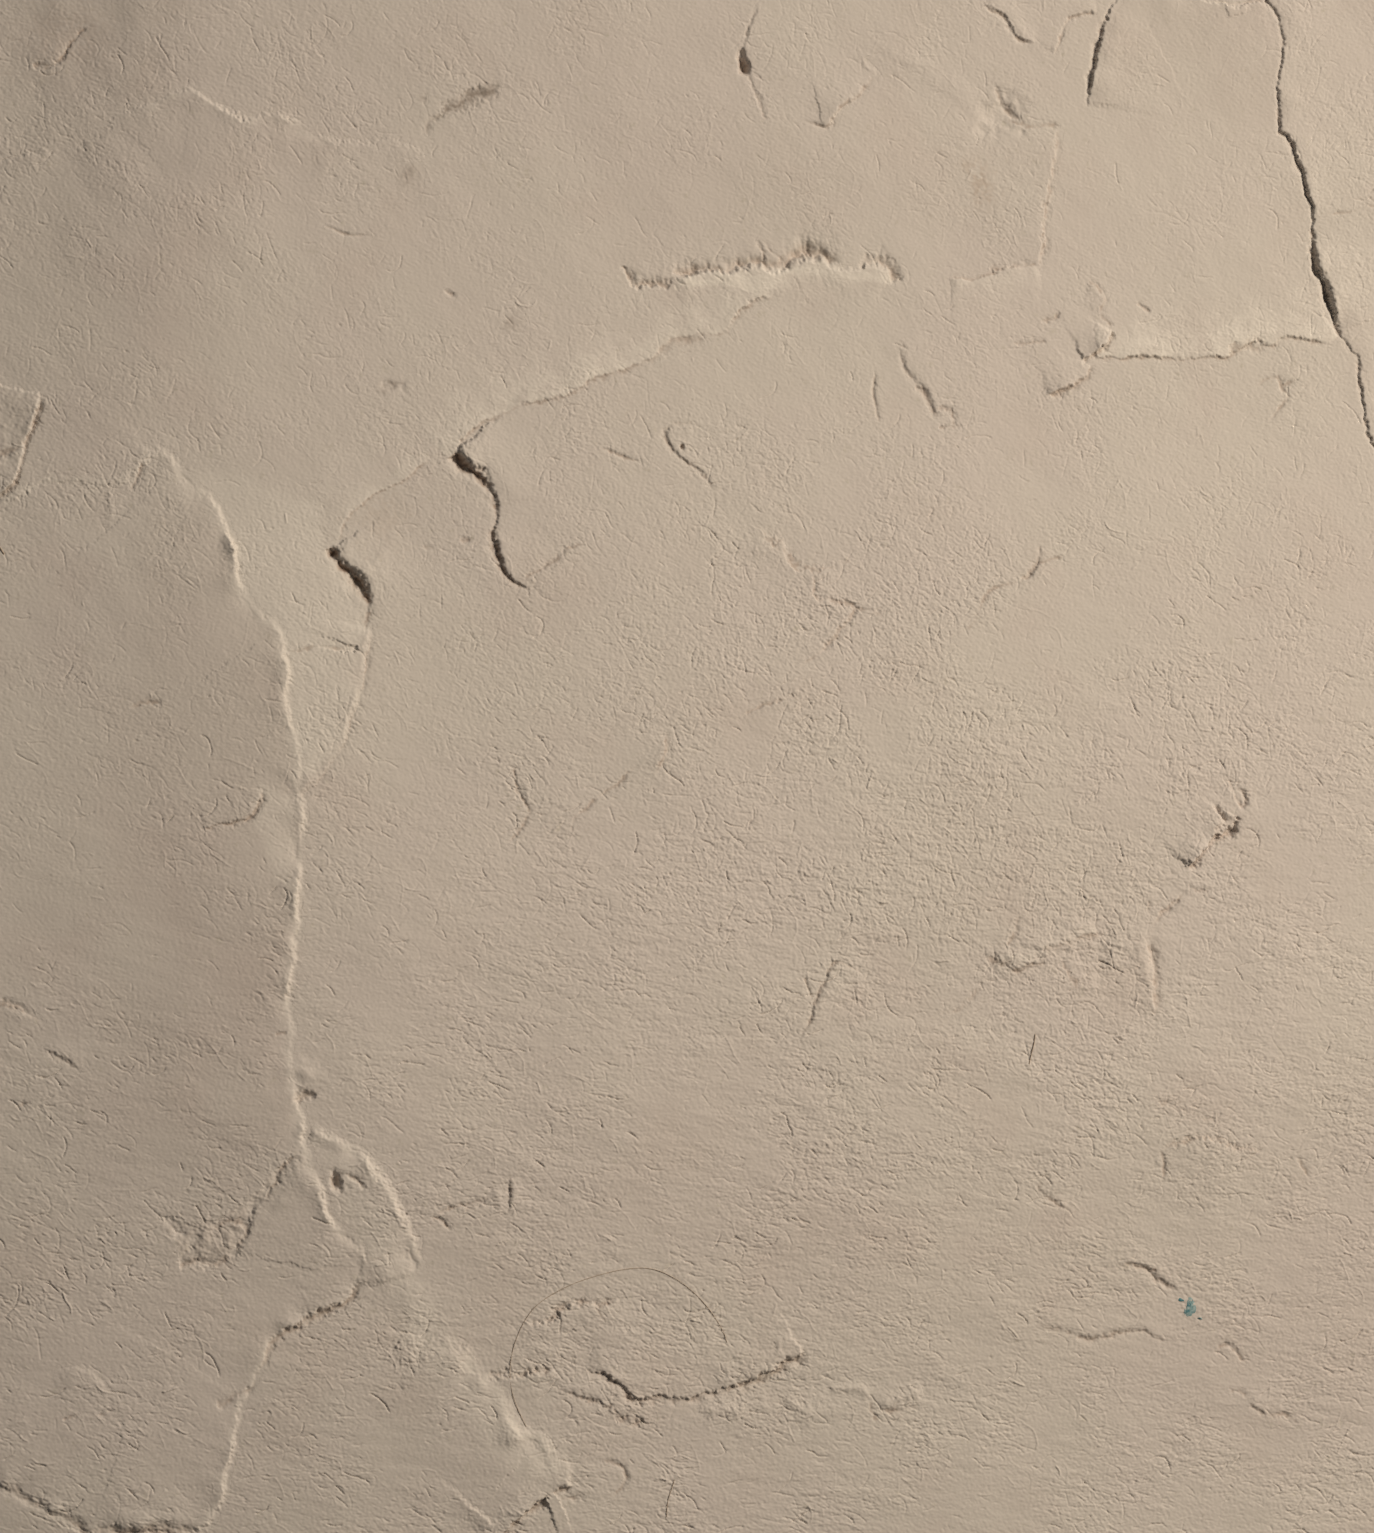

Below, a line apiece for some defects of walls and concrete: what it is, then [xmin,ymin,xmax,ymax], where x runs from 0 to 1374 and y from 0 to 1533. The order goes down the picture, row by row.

crack [1264,0,1374,458]
peeling [0,383,45,498]
crack [441,288,459,302]
crack [870,371,883,423]
crack [1014,280,1152,400]
crack [421,442,586,598]
crack [583,1334,808,1430]
crack [495,1480,573,1533]